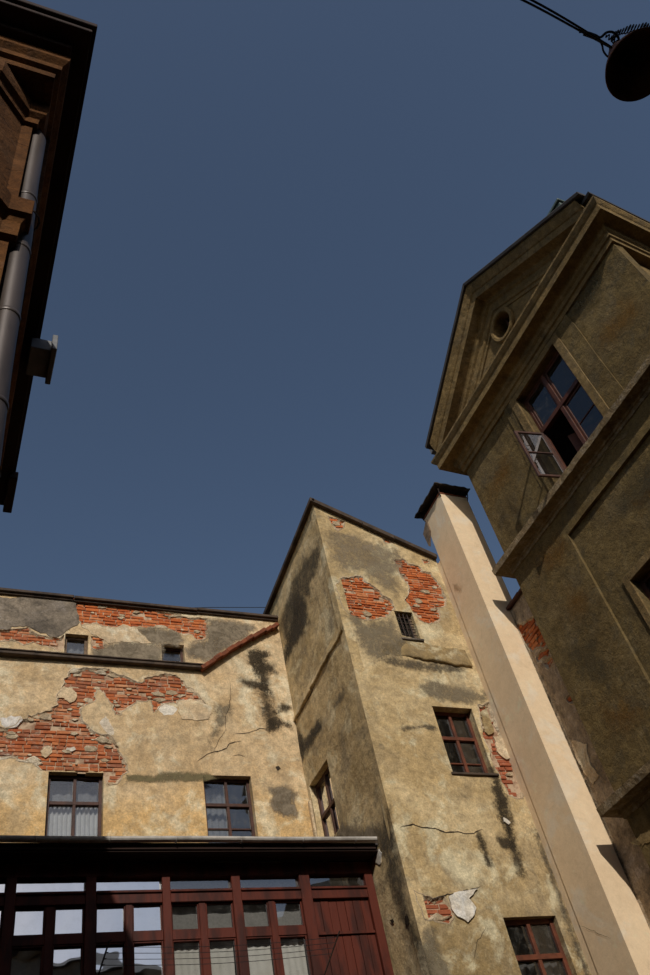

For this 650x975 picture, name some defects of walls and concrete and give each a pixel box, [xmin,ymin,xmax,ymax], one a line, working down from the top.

spalling [335,558,447,625]
spalling [0,627,64,652]
spalling [76,604,208,651]
spalling [517,616,555,670]
spalling [0,667,207,786]
crack [198,687,265,761]
spalling [471,701,524,800]
crack [400,824,482,834]
spalling [414,889,477,925]